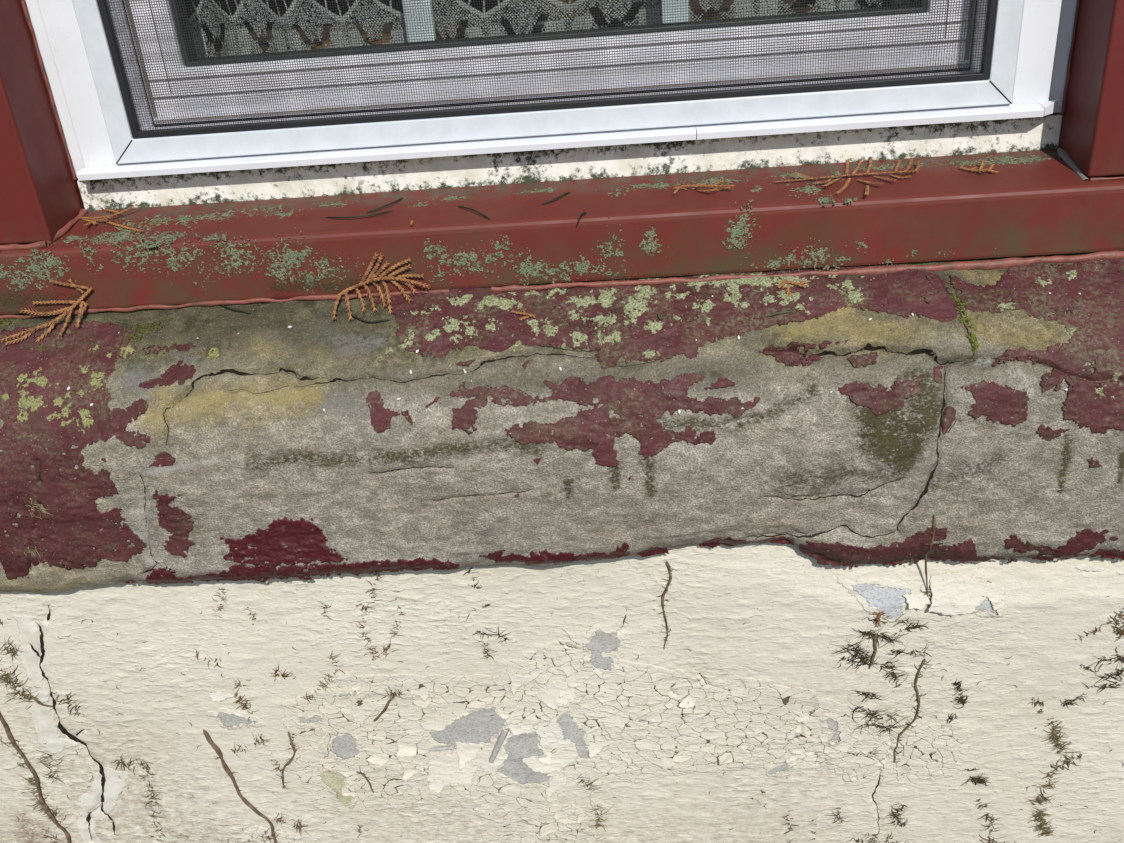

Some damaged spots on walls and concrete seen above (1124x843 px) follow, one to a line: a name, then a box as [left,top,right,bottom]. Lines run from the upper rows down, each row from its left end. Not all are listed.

peeling [363,256,1124,467]
peeling [0,320,196,580]
crack [372,465,453,473]
crack [749,292,1070,538]
peeling [125,490,460,585]
peeling [479,542,669,564]
peeling [699,527,1124,622]
crack [30,605,115,841]
peeling [207,691,265,730]
peeling [281,612,971,843]
peeling [229,825,307,843]